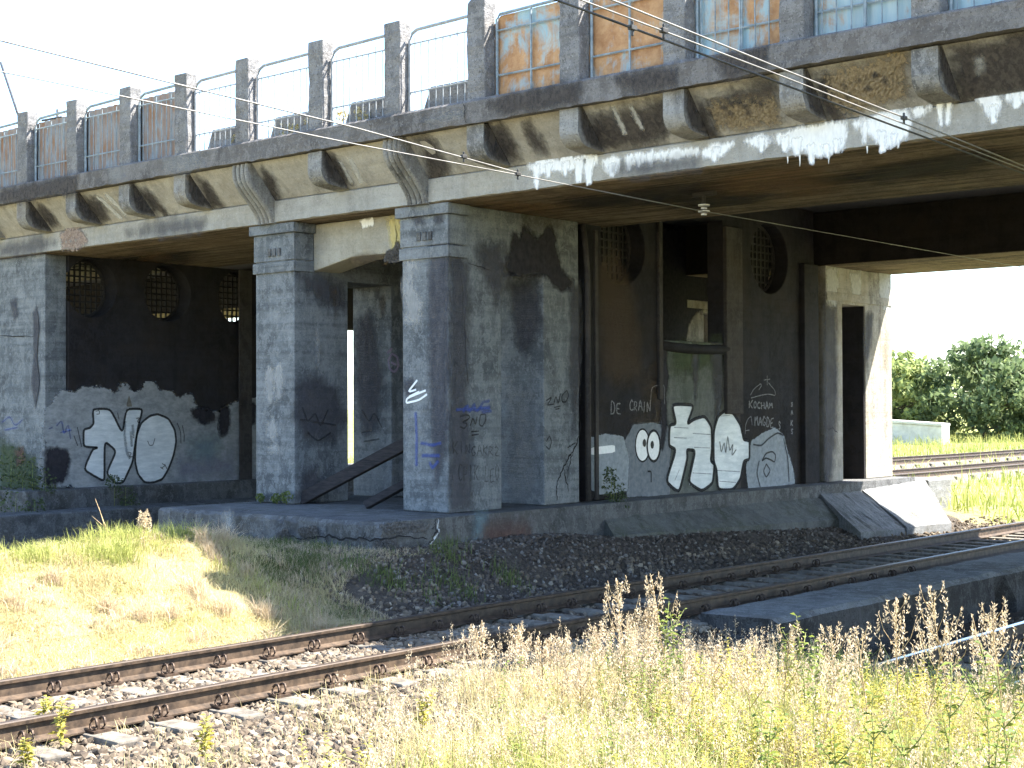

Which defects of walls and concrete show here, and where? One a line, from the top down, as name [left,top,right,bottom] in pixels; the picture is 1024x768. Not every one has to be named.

water stain [485,30,1024,211]
spalling [60,227,88,252]
water stain [478,246,542,351]
crack [287,519,440,547]